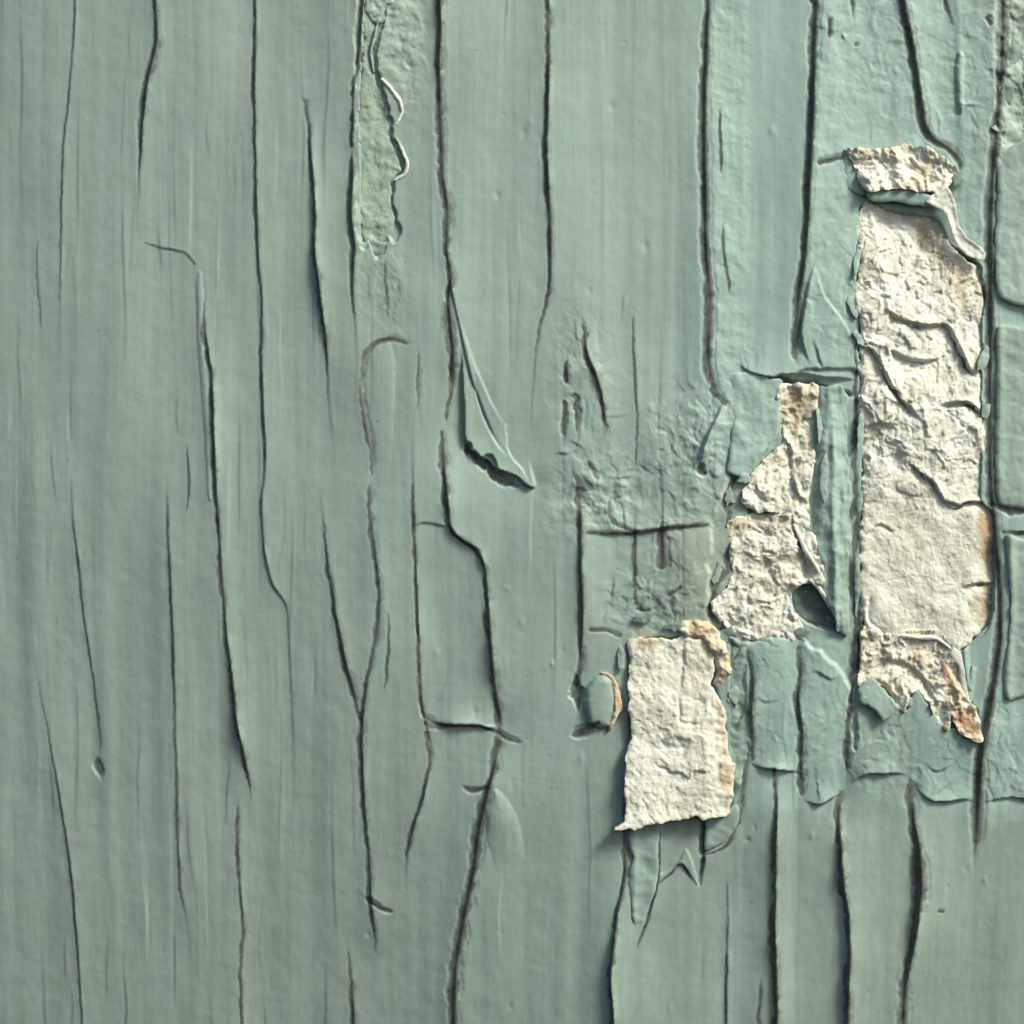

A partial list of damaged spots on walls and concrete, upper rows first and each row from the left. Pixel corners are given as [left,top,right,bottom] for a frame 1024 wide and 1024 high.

crack [166,313,250,904]
crack [323,263,419,943]
peeling [359,0,409,256]
crack [405,0,522,1024]
crack [572,461,737,737]
crack [699,0,731,405]
crack [706,547,806,1024]
crack [777,0,861,1024]
peeling [614,140,1024,926]
crack [900,782,944,1024]
crack [899,0,962,168]
crack [973,0,1024,844]